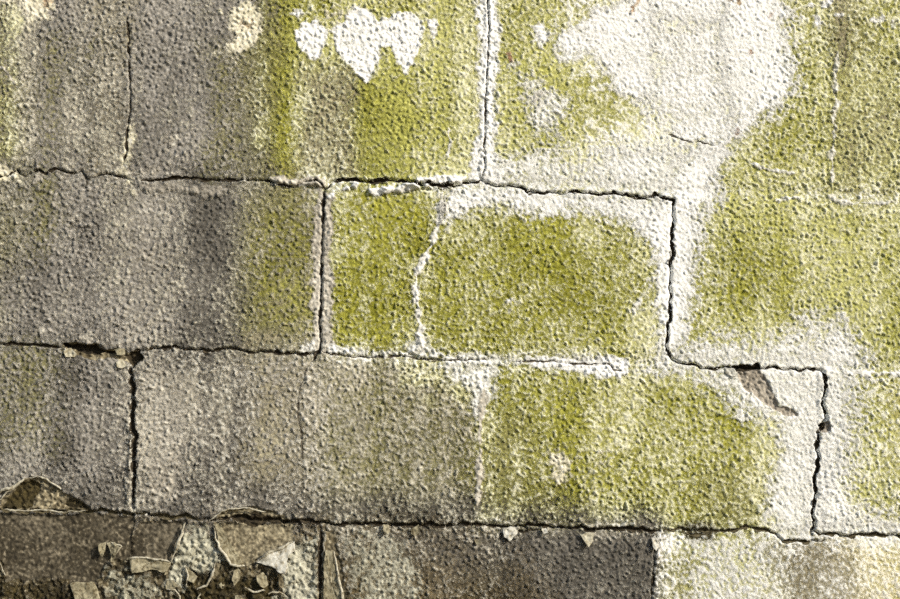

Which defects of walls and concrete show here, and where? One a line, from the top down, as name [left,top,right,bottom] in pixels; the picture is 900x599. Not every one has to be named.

crack [123,17,131,162]
crack [445,127,453,157]
crack [483,0,491,123]
leakage [565,77,621,131]
crack [0,133,900,599]
spalling [724,362,798,416]
peeling [0,331,201,599]
peeling [209,506,297,599]
peeling [321,531,347,599]